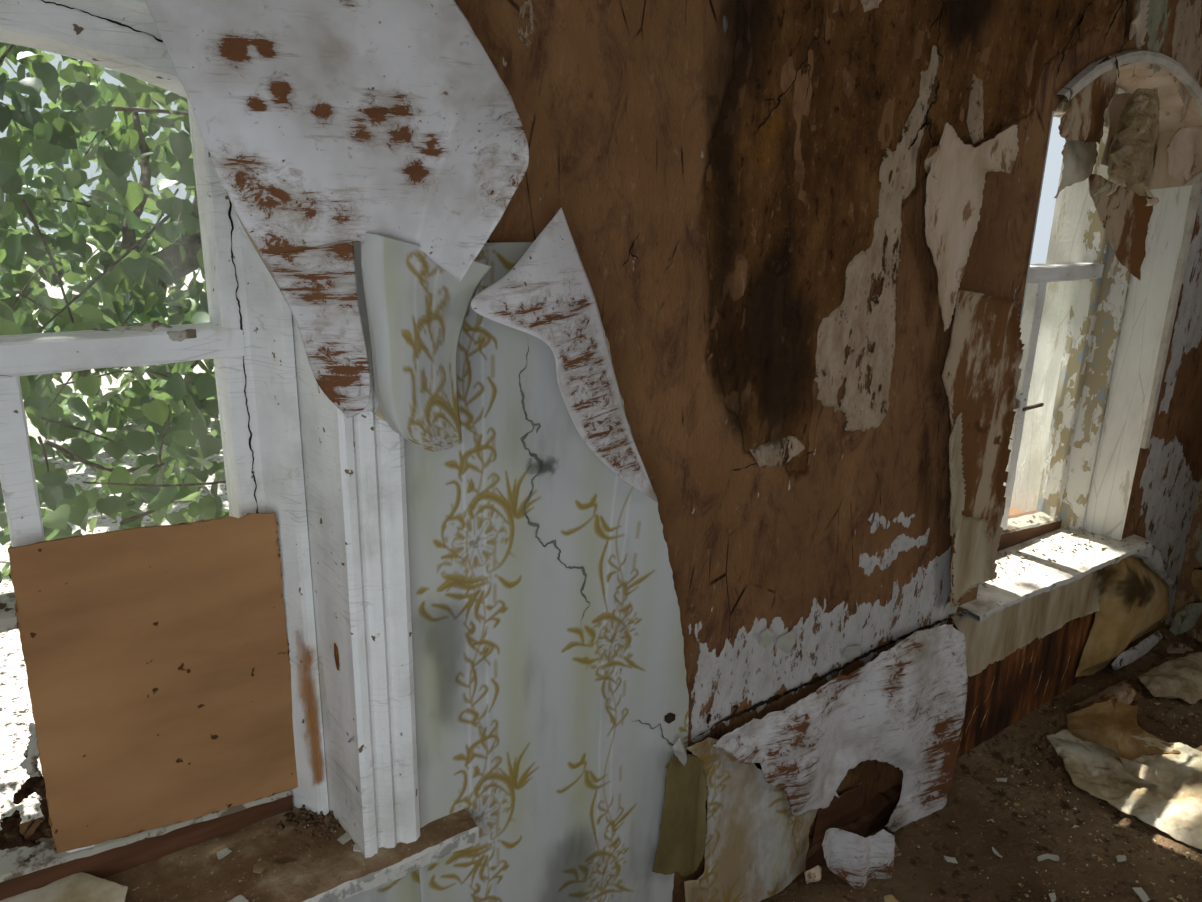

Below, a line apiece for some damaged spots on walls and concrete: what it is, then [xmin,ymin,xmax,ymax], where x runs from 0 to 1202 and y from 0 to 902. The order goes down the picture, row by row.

water stain [713,0,768,288]
water stain [723,246,810,442]
spalling [701,0,1120,480]
peeling [1129,0,1202,122]
peeling [1159,193,1202,414]
crack [519,347,591,631]
peeling [689,512,960,743]
peeling [1140,435,1202,624]